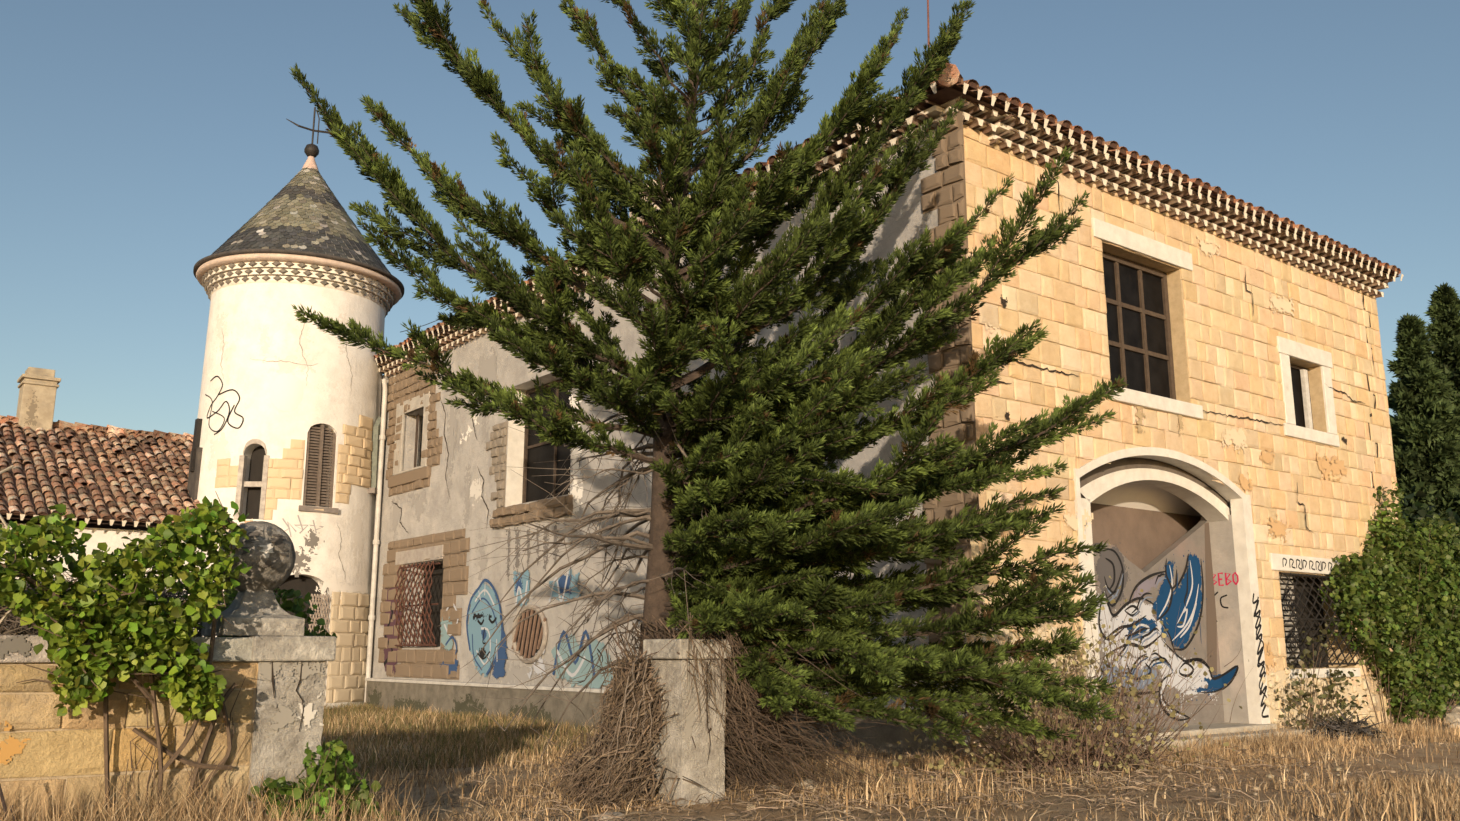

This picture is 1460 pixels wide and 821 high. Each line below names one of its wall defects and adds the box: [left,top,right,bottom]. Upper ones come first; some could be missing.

flaking render [241,361,508,568]